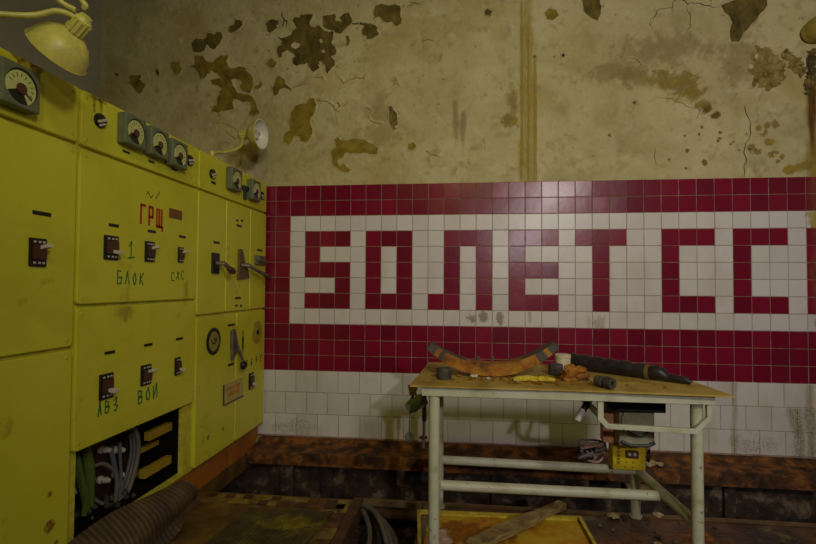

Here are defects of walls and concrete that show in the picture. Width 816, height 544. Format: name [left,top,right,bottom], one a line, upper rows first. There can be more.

peeling [580,0,603,22]
crack [649,0,715,33]
flaking render [718,0,770,46]
peeling [170,2,404,118]
peeling [114,72,147,95]
peeling [282,97,342,146]
peeling [330,136,380,174]
peeling [386,104,400,132]
crack [743,103,751,176]
corrosion [808,84,816,176]